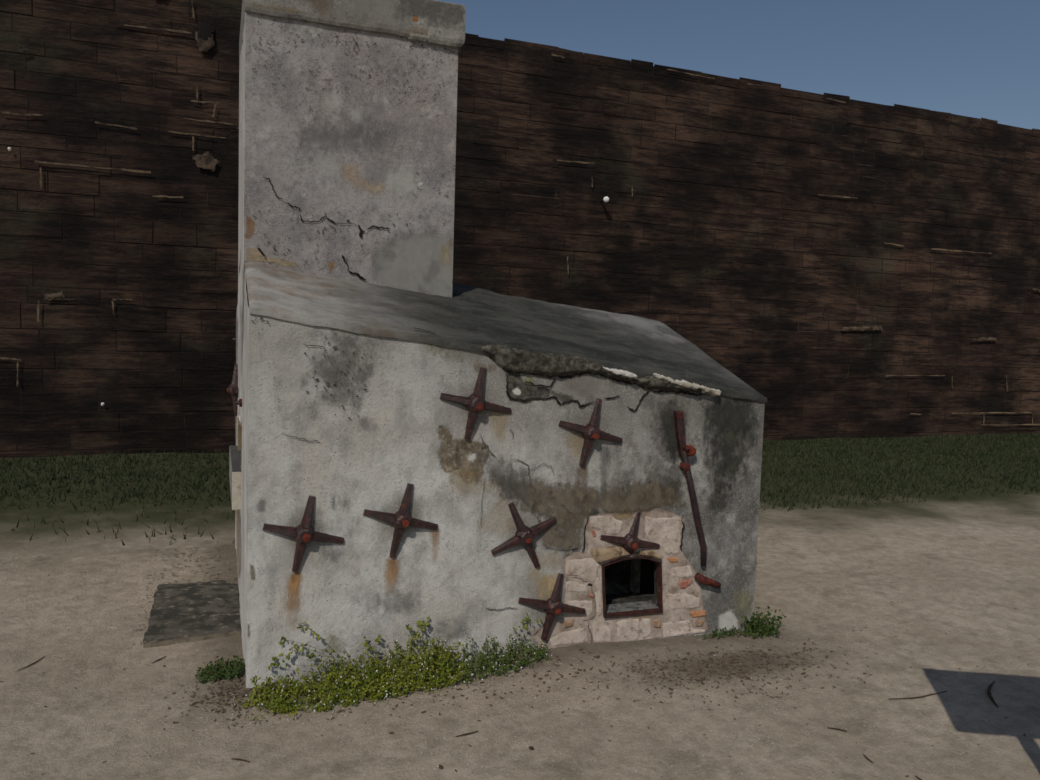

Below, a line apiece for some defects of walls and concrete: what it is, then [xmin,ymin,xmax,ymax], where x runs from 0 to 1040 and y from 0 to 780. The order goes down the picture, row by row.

crack [262,177,390,280]
crack [489,356,709,412]
spalling [479,343,721,402]
leakage [486,397,686,552]
leakage [704,398,753,489]
corrosion [289,572,300,599]
corrosion [386,560,397,582]
crack [480,428,600,642]